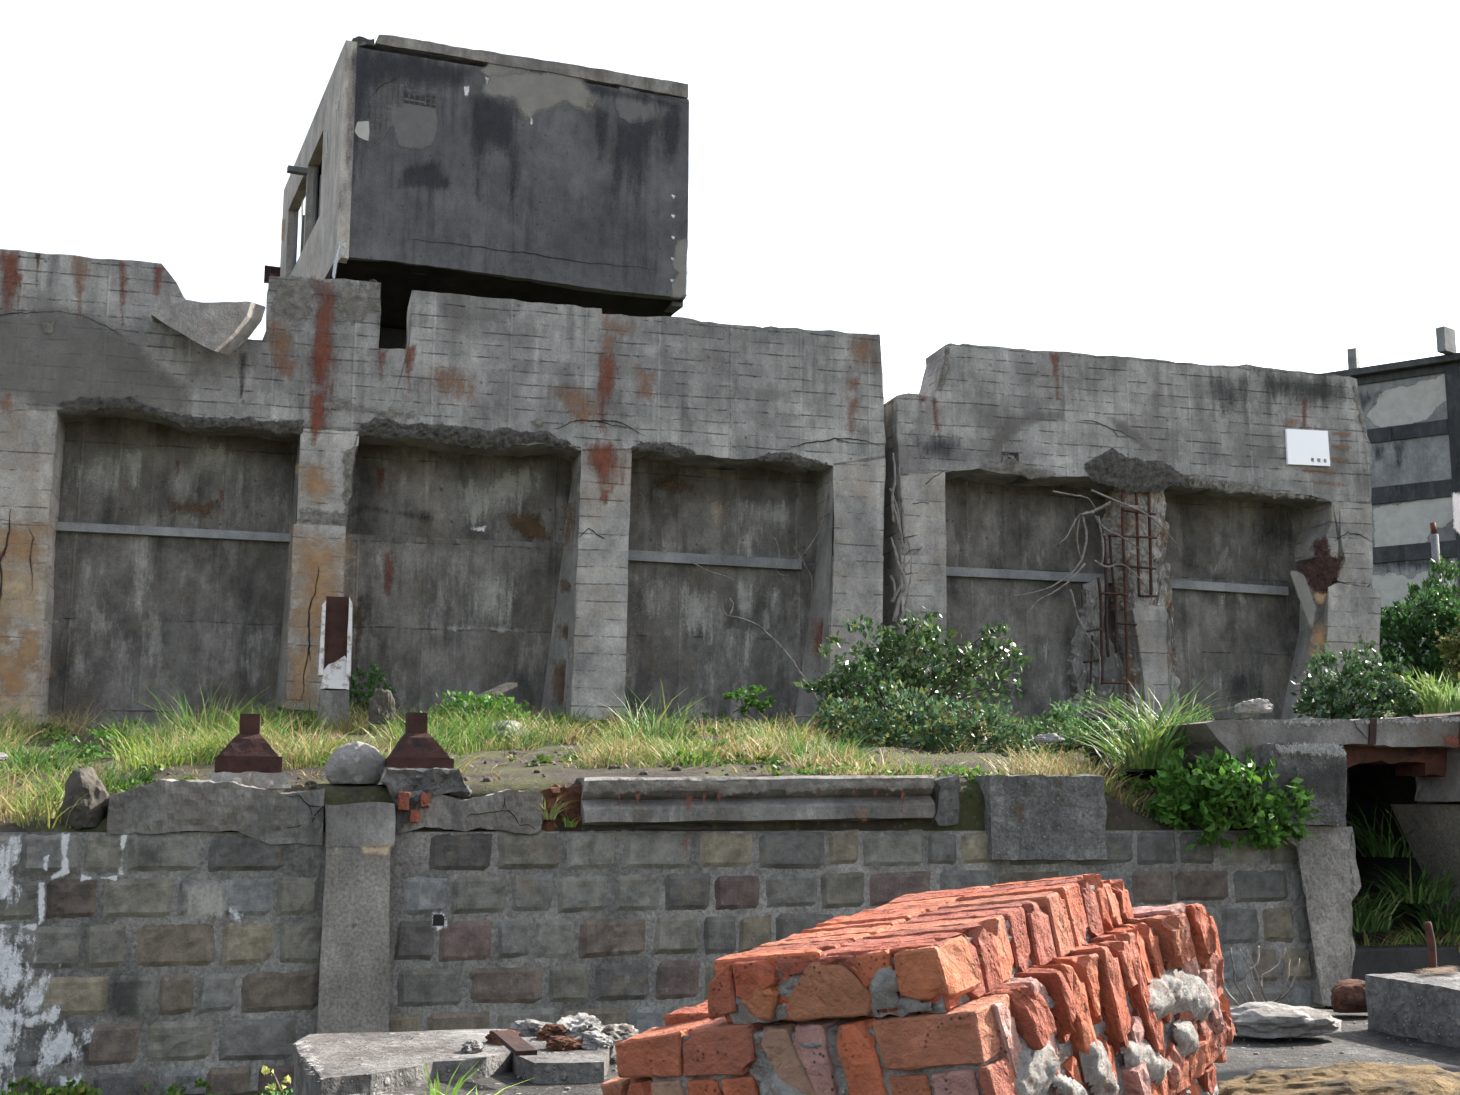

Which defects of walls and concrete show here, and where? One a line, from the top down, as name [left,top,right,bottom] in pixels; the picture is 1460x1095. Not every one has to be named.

damp [335,49,516,199]
peeling [480,63,596,119]
damp [587,85,678,184]
rust [0,251,40,304]
peeling [0,312,304,435]
rust [310,284,335,440]
rust [590,321,624,503]
peeling [1353,374,1446,443]
crack [0,510,34,599]
crack [302,567,319,697]
peeling [1371,559,1458,607]
peeling [1373,493,1460,547]